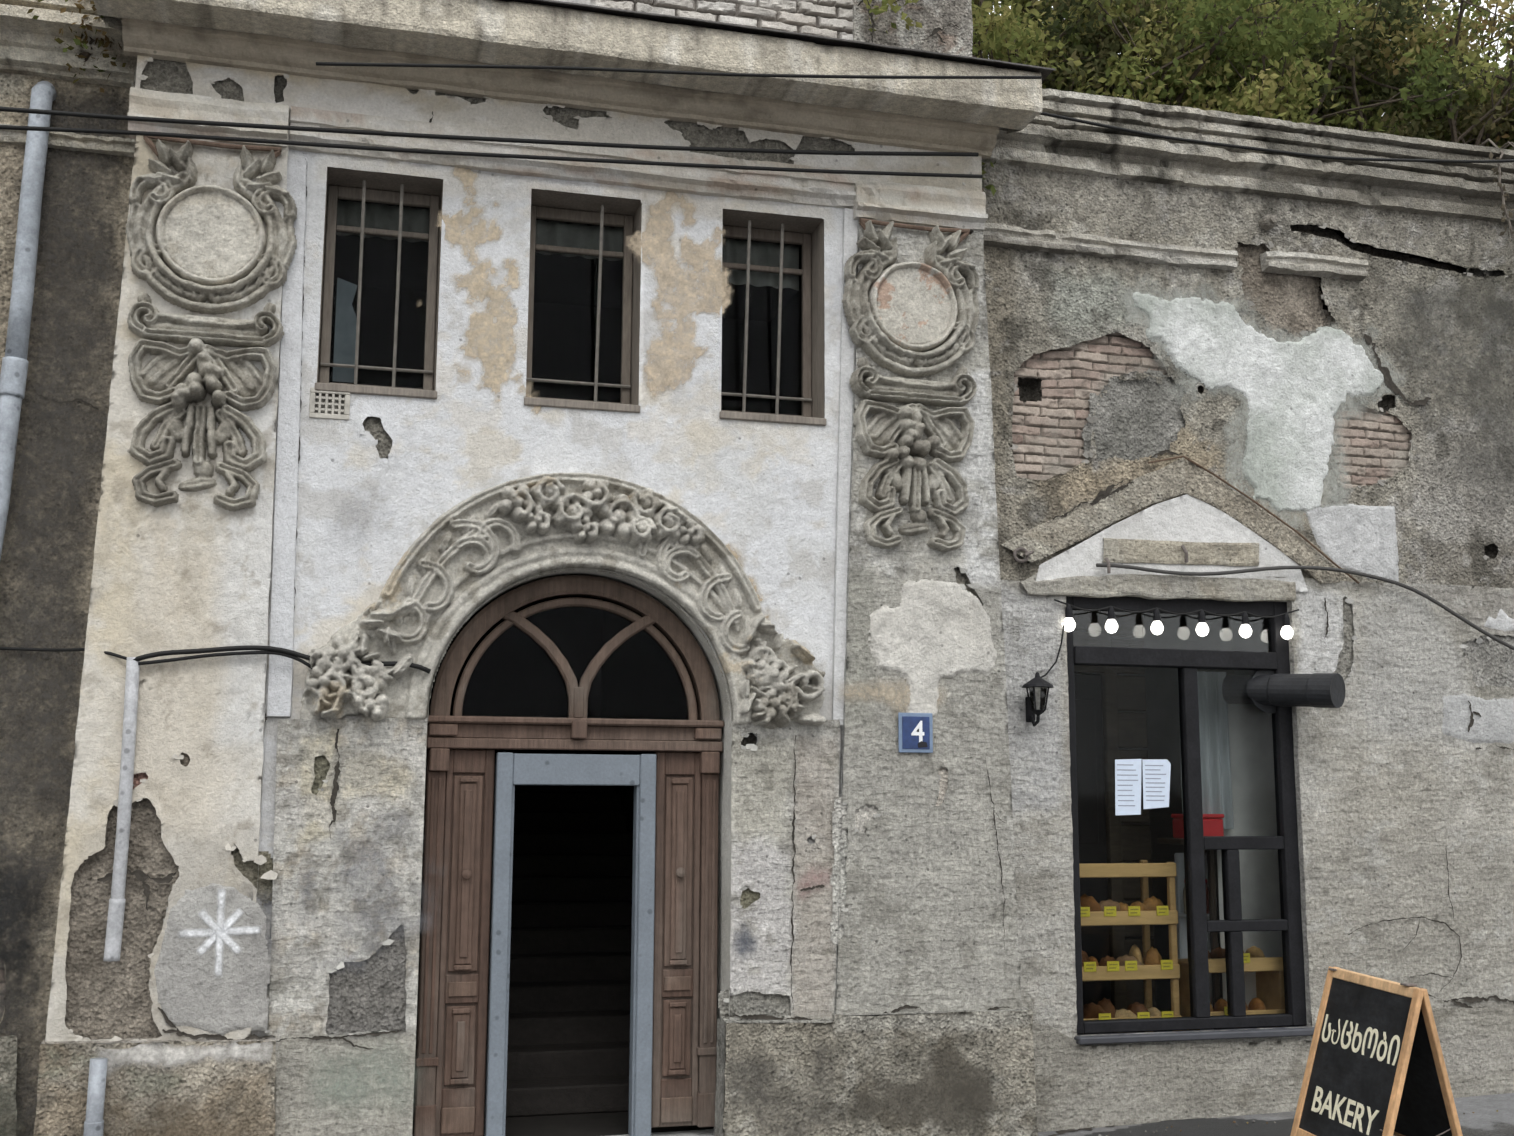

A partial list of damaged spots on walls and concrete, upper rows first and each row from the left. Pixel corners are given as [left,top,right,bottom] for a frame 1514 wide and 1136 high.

peeling [664,120,855,164]
peeling [439,167,524,401]
peeling [630,191,731,394]
flaking render [1235,241,1335,339]
flaking render [1009,332,1204,480]
flaking render [1332,395,1413,489]
water stain [0,93,128,1136]
flaking render [65,772,179,1044]
flaking render [325,924,407,1035]
crack [1348,846,1514,1008]
crack [1048,1125,1115,1136]